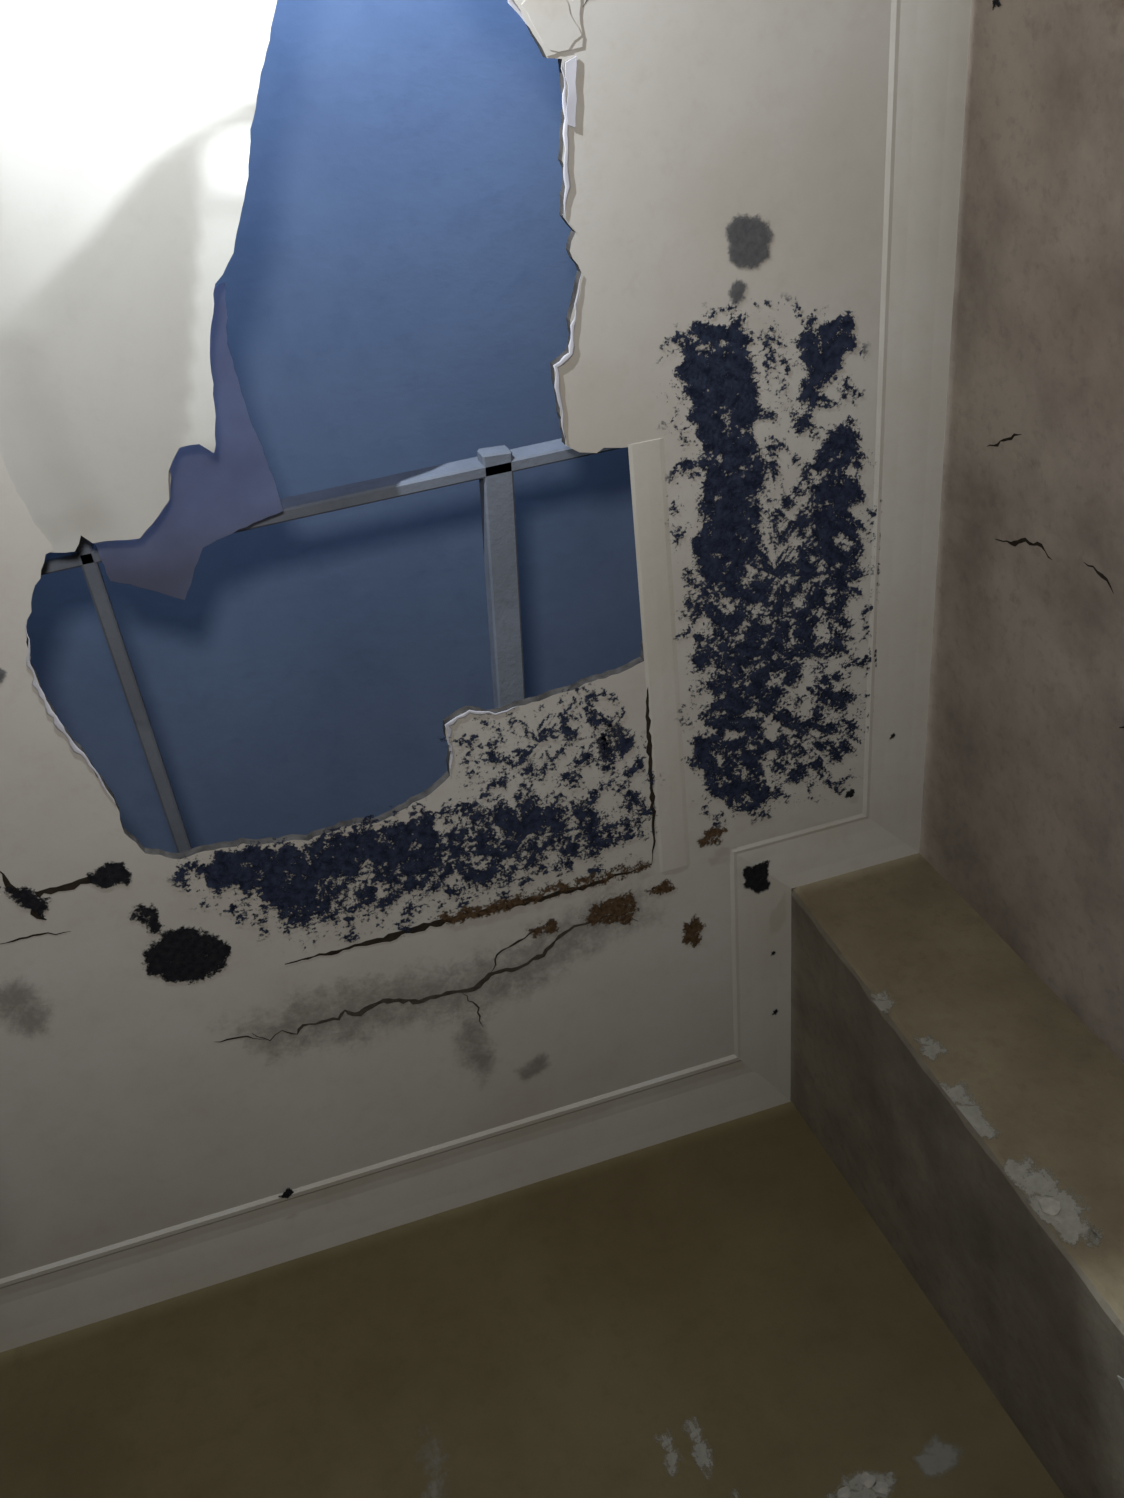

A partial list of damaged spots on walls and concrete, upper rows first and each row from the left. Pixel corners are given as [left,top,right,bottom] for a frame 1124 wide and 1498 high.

peeling [516,0,587,127]
crack [987,433,1022,447]
water stain [660,216,881,828]
crack [995,538,1114,594]
water stain [171,684,657,949]
crack [220,688,676,1042]
water stain [130,903,231,985]
spalling [939,1081,999,1139]
spalling [1004,1157,1103,1247]
peeling [655,1417,713,1479]
peeling [827,1471,896,1498]
peeling [915,1438,959,1475]